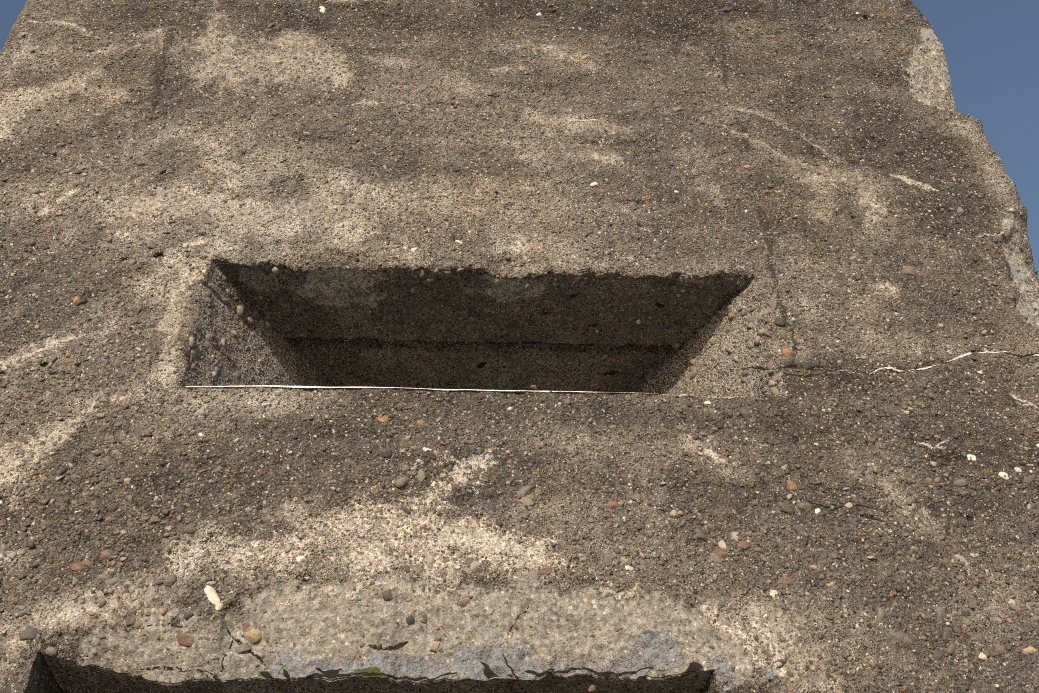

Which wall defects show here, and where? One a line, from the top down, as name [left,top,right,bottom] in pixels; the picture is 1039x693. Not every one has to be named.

crack [744,351,1039,376]
crack [121,608,196,631]
crack [137,619,266,678]
crack [480,606,529,678]
crack [292,672,457,681]
crack [550,667,653,676]